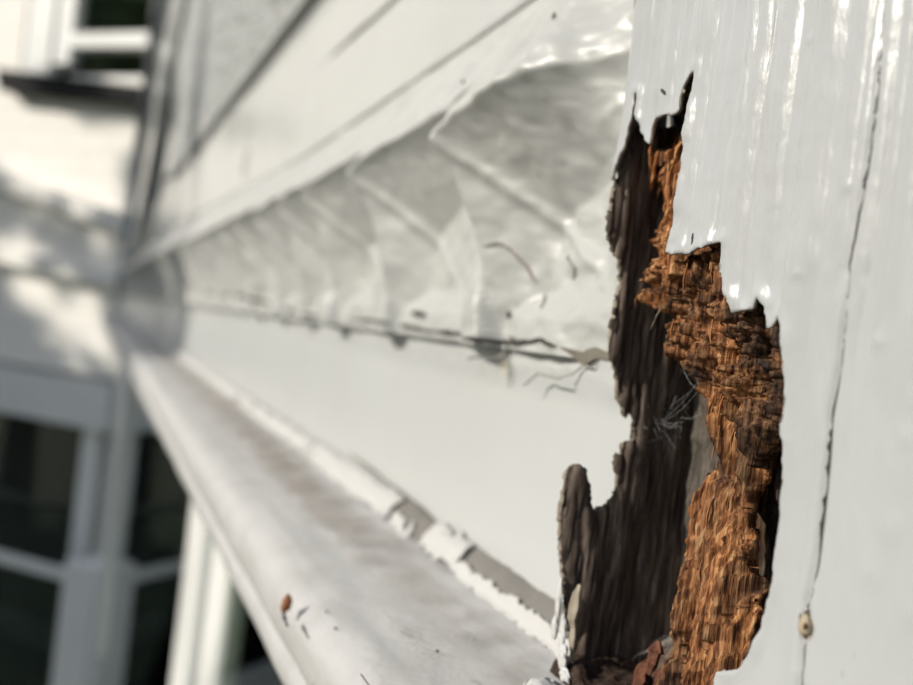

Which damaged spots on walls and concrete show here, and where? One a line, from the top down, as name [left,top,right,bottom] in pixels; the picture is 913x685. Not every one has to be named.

crack [799,11,884,621]
crack [800,642,808,685]